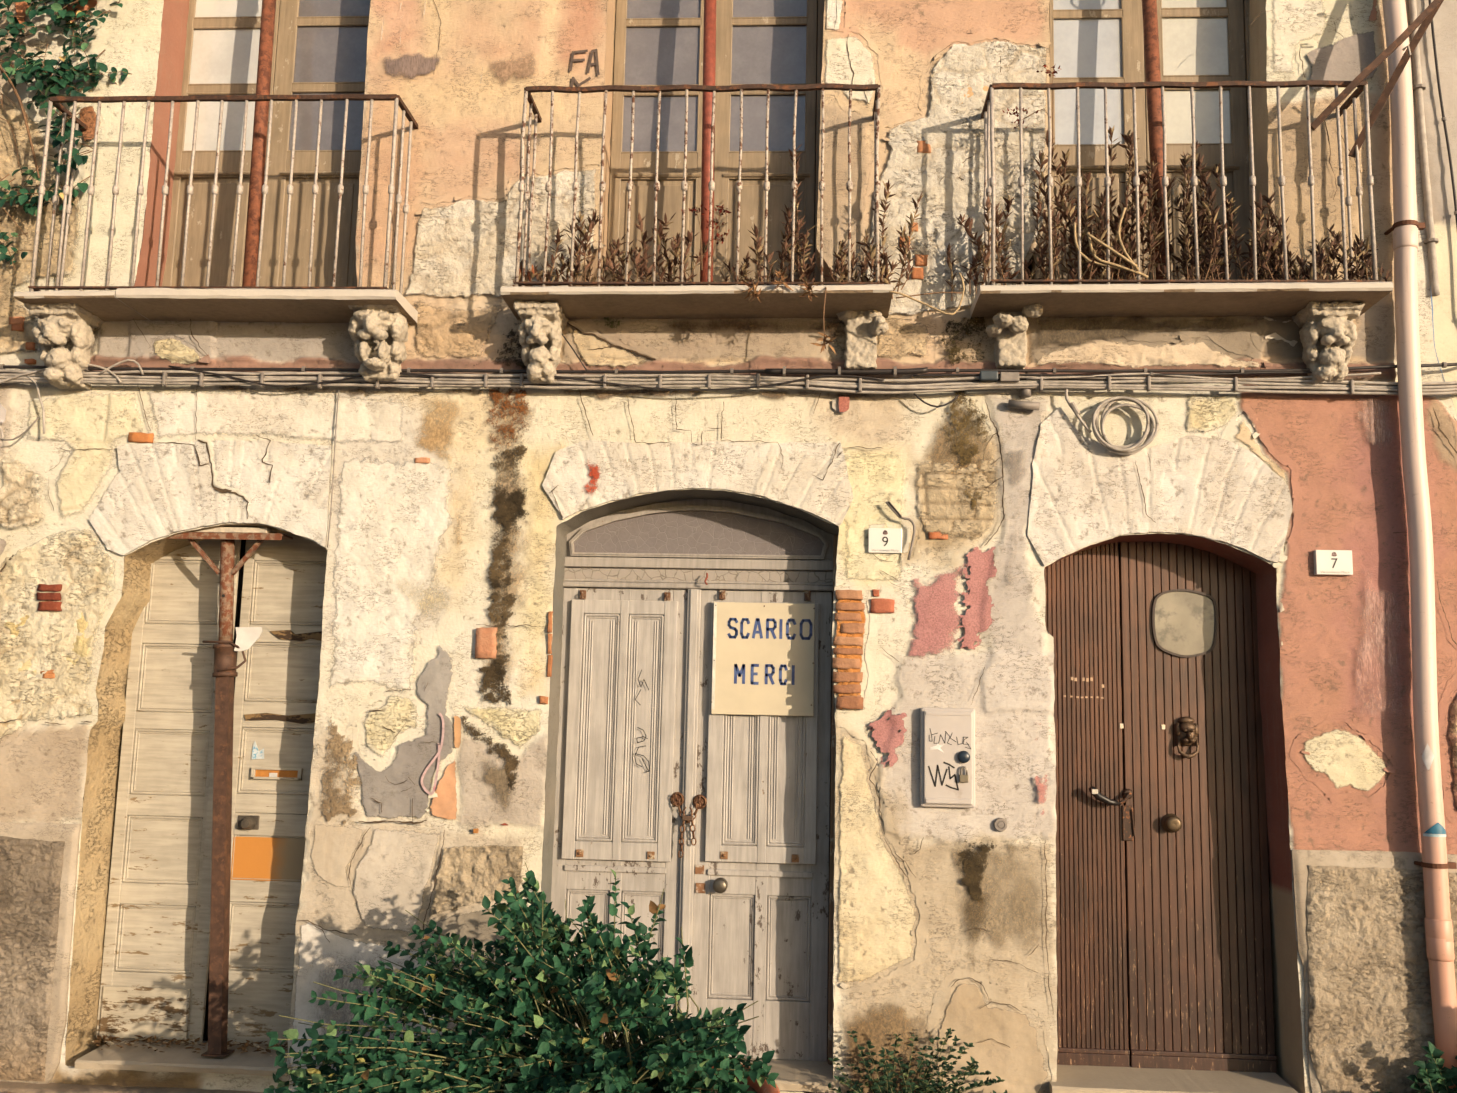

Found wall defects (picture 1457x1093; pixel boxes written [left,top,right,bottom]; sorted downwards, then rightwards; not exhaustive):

crack [138,388,273,519]
flaking render [4,327,453,772]
leakage [418,388,482,458]
peeling [395,155,605,358]
leakage [479,397,531,705]
flaking render [815,318,846,365]
peeling [824,0,1051,369]
spalling [832,454,998,997]
peeling [1289,720,1397,806]